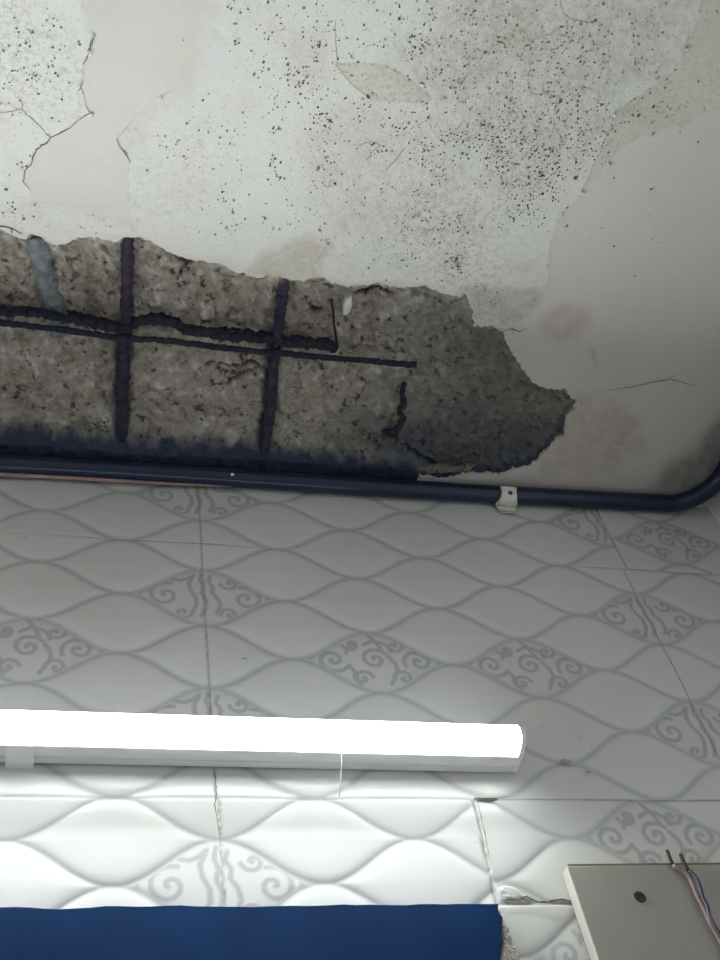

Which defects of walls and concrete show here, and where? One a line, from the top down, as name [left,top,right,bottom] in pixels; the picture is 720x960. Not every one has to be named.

water stain [0,3,70,95]
crack [0,100,90,182]
water stain [220,0,688,286]
peeling [0,0,720,480]
crack [607,375,694,391]
crack [212,769,220,831]